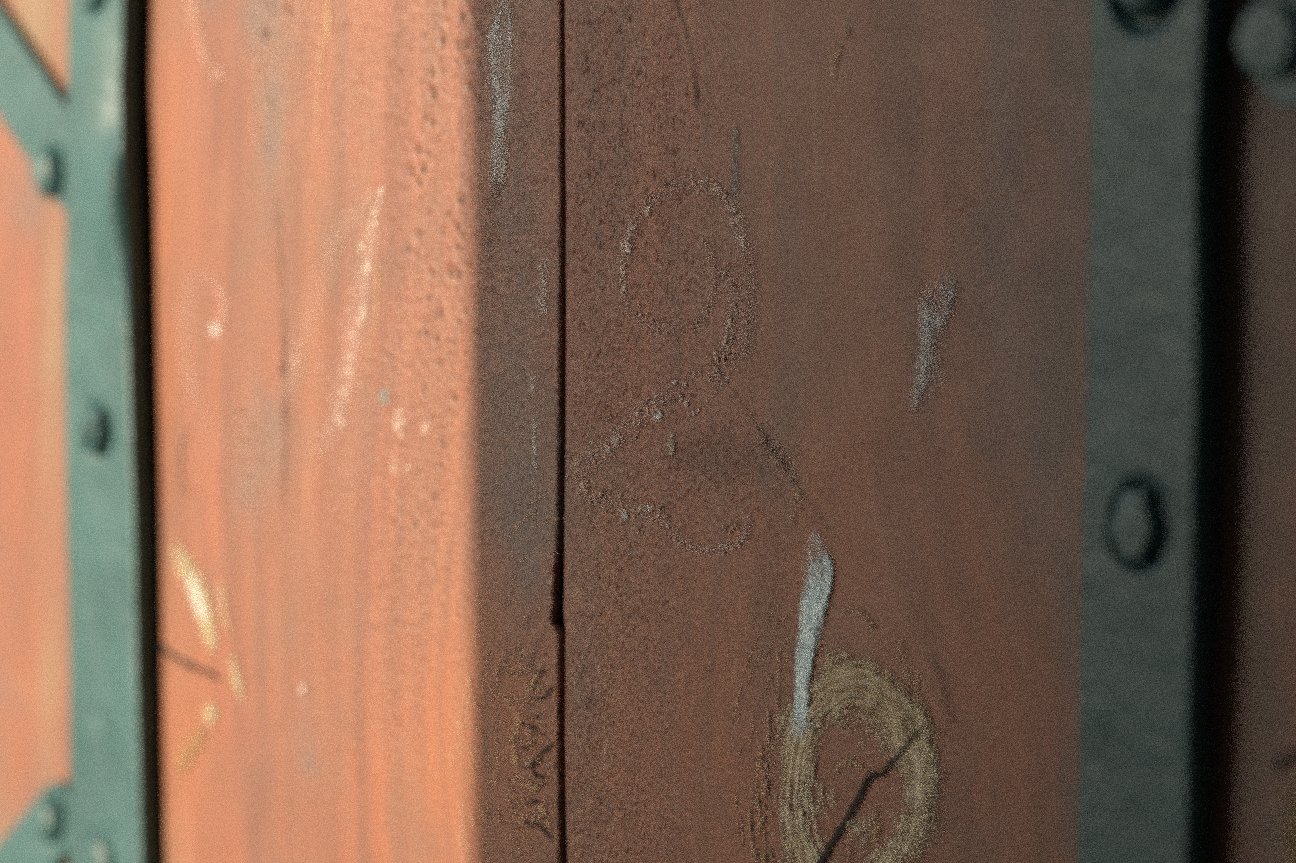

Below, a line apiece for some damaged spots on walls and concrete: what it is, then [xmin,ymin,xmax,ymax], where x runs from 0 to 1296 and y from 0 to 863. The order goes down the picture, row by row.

crack [818,724,927,863]